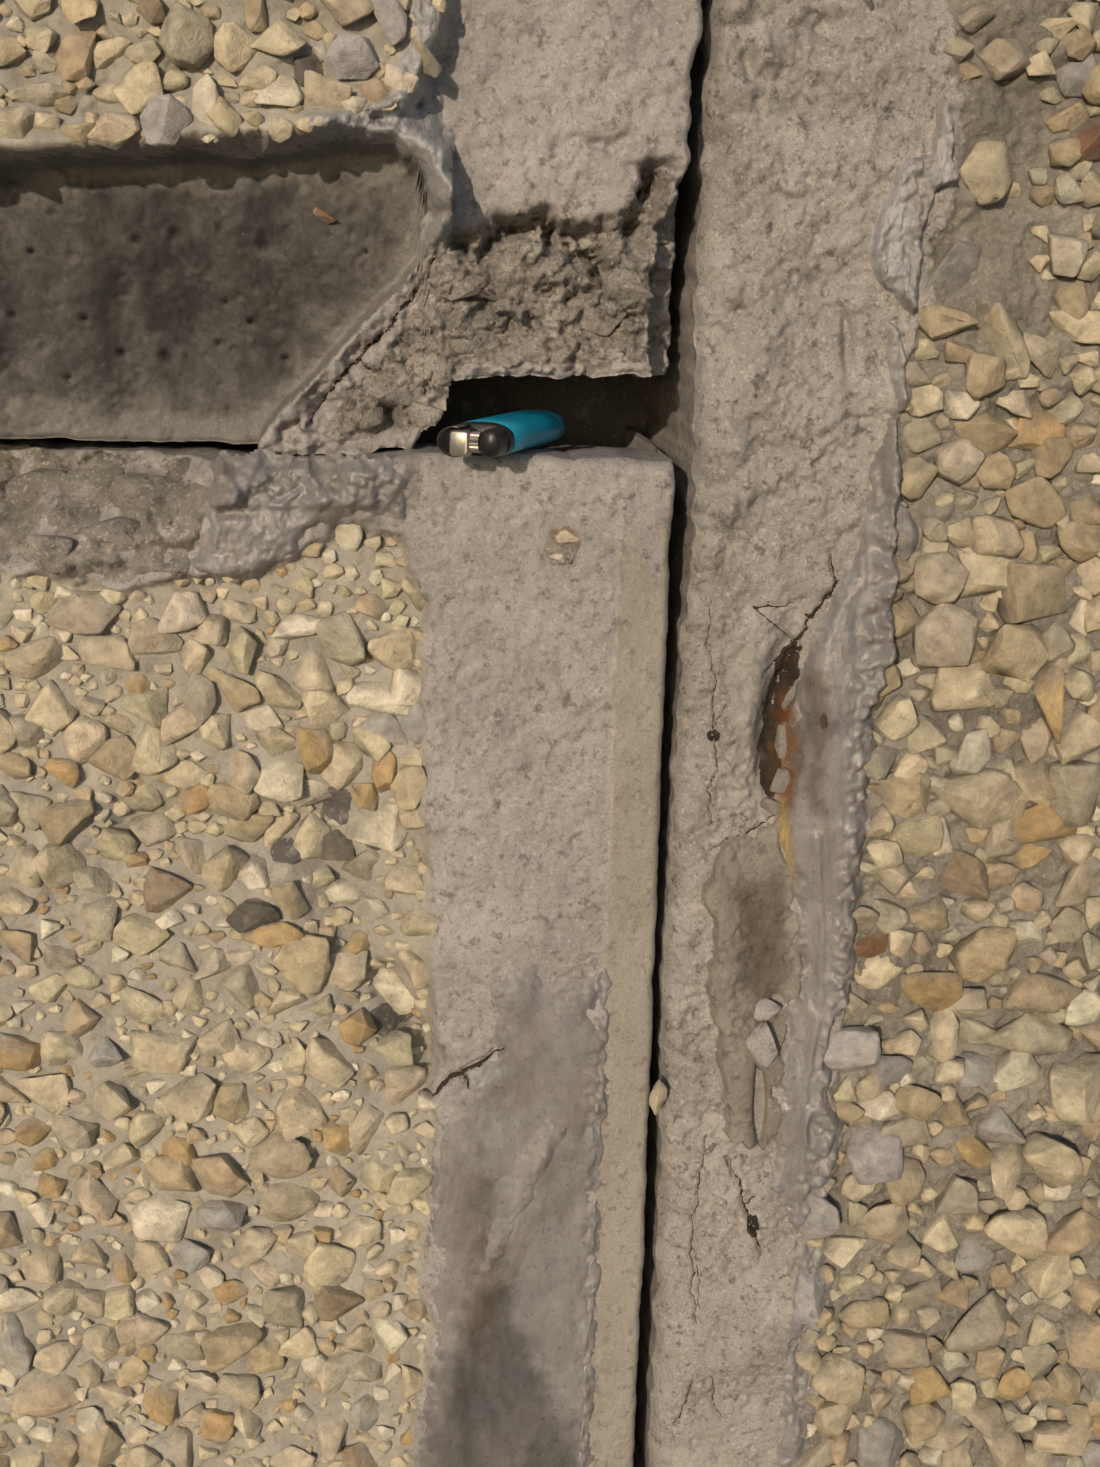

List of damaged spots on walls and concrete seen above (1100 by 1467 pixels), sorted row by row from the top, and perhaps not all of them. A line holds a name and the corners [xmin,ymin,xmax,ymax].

spalling [318,169,676,440]
crack [753,551,839,672]
crack [705,598,775,851]
rust [779,705,795,860]
crack [689,1135,762,1324]
crack [673,1376,722,1426]